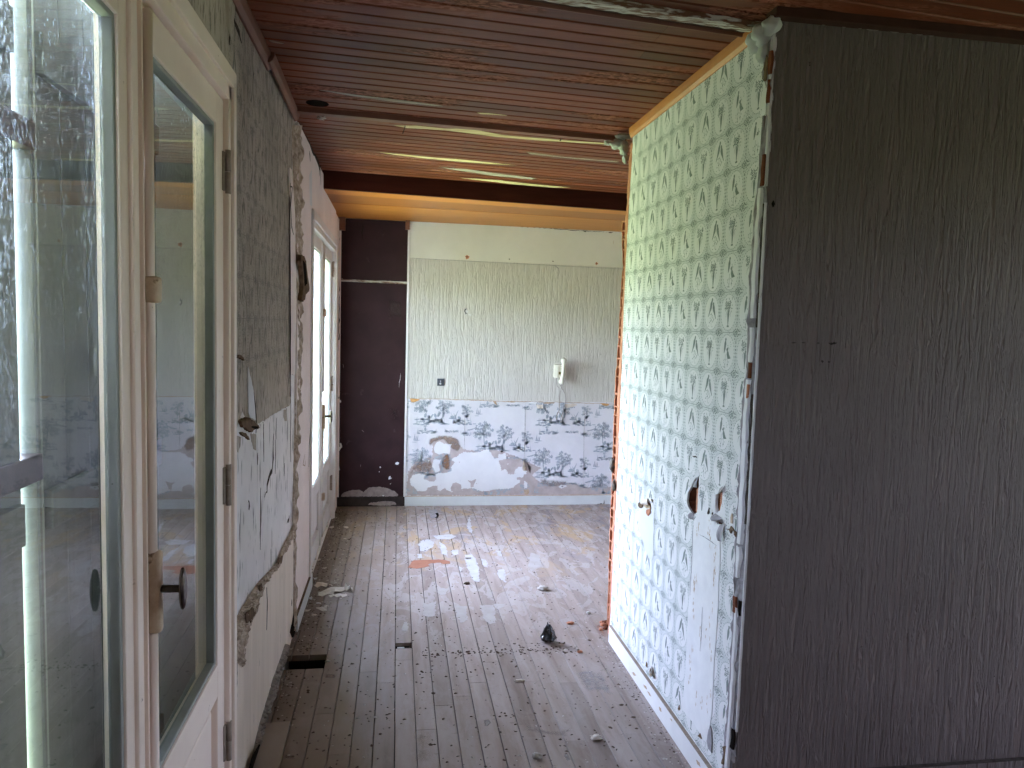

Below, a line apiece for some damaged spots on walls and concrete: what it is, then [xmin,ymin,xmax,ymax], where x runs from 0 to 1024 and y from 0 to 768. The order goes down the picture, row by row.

peeling [341,462,399,506]
peeling [428,441,452,473]
spalling [688,471,725,542]
spalling [237,525,295,667]